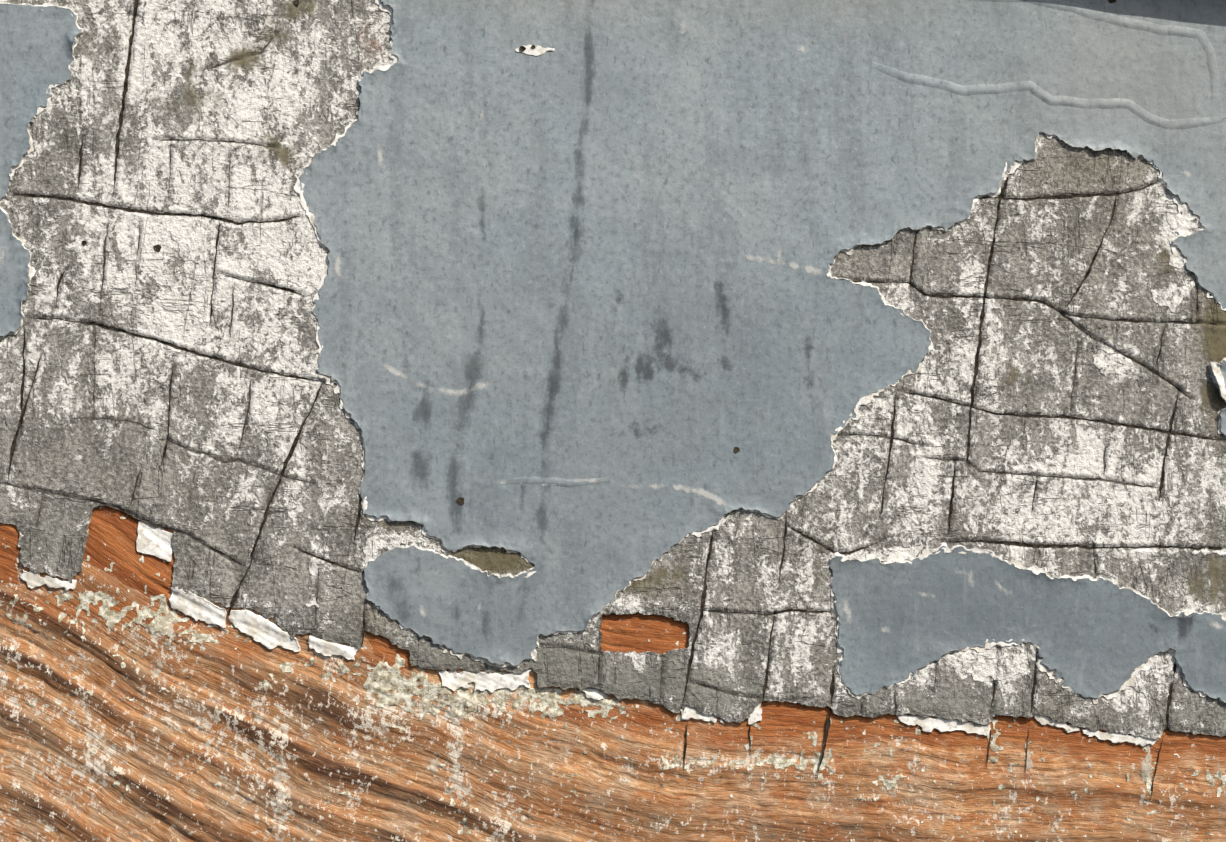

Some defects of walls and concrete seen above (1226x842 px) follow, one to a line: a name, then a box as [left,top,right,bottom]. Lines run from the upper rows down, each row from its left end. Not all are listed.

crack [1,0,323,620]
damp [622,359,652,382]
crack [779,177,1226,581]
peeling [10,594,44,632]
peeling [177,629,219,651]
peeling [263,662,293,705]
peeling [661,732,722,781]
crack [660,531,830,773]
peeling [728,721,842,786]
crack [817,673,863,777]
crack [1025,656,1037,777]
crack [1150,664,1177,800]